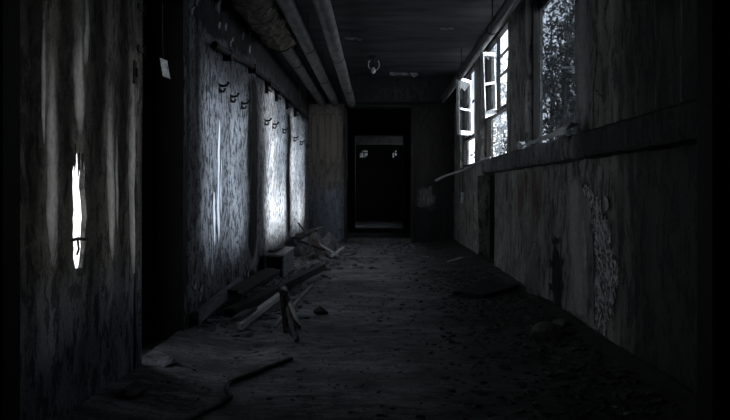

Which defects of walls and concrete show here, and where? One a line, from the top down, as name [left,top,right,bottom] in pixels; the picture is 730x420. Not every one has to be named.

flaking render [580,182,619,338]